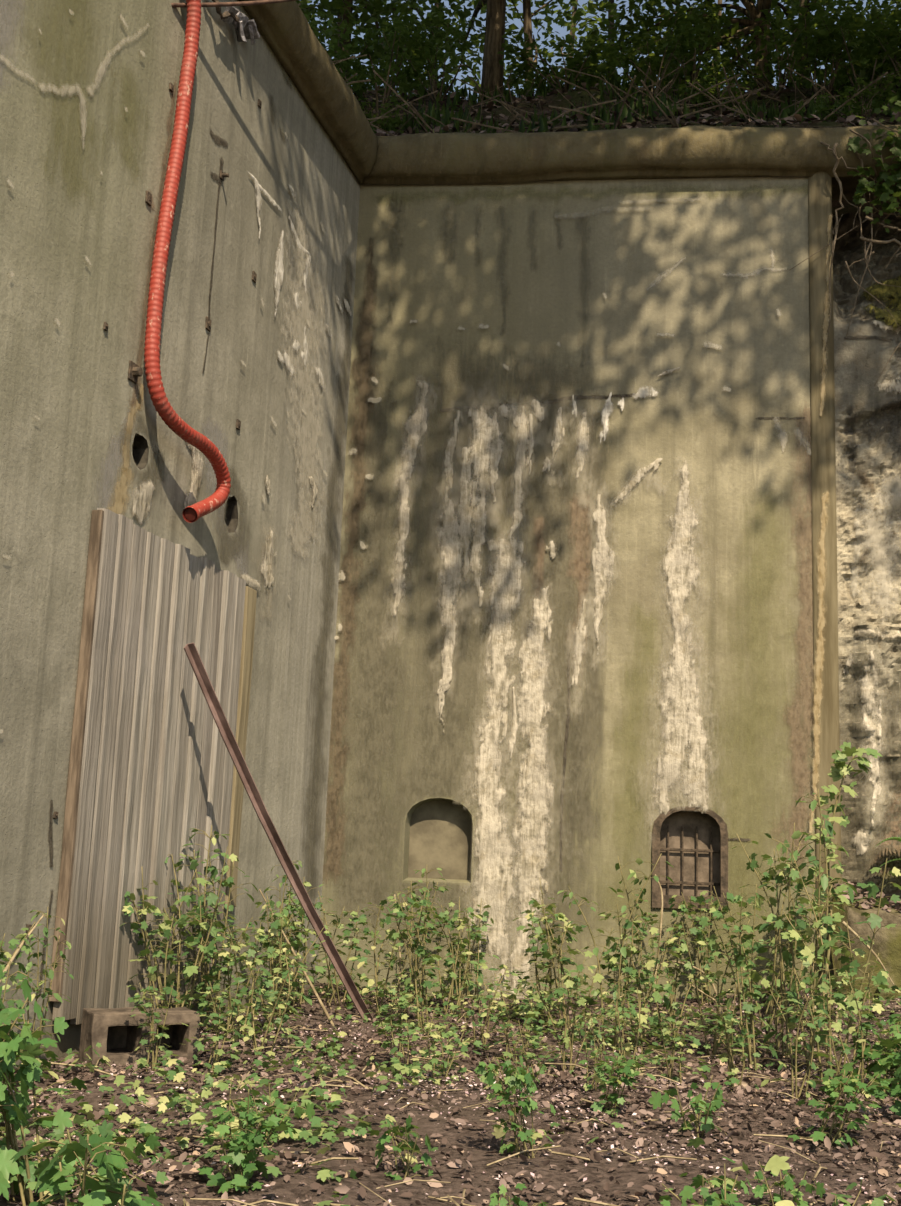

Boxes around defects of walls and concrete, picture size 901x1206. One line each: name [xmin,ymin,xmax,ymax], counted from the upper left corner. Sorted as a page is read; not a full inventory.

leakage [218,503,274,590]
leakage [249,173,680,1000]
leakage [654,460,709,814]